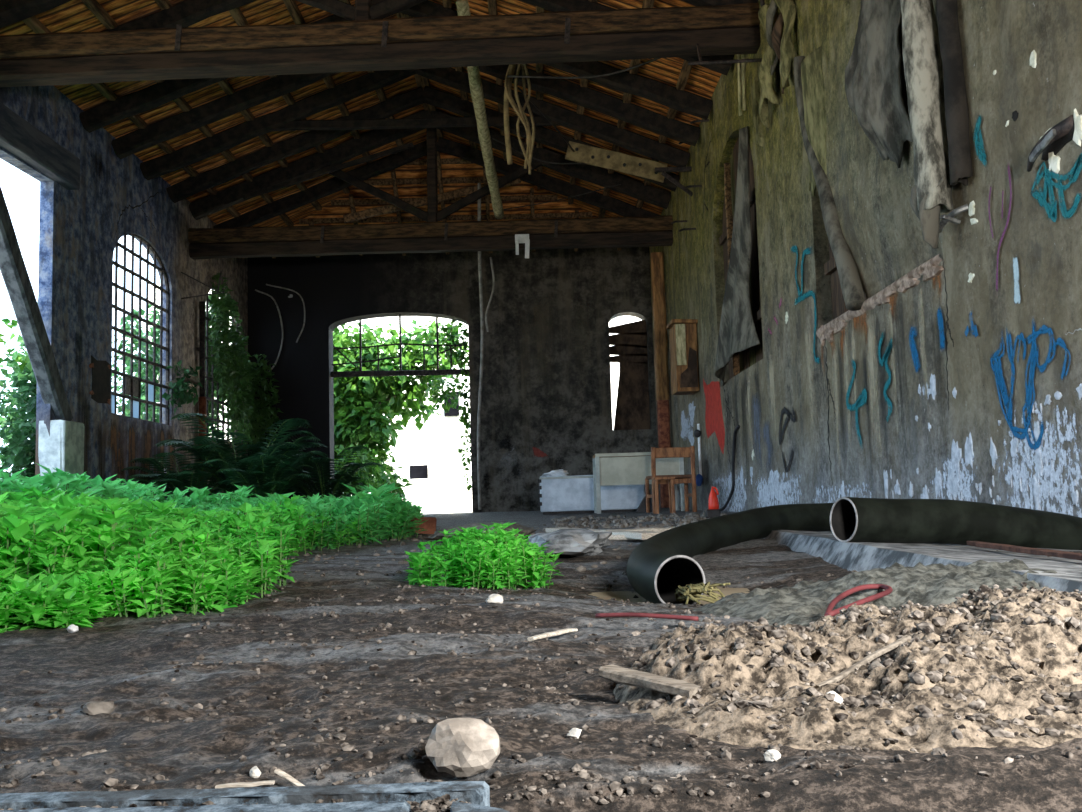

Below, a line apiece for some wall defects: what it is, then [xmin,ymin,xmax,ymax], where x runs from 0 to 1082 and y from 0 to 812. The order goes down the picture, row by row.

spalling [968,200,978,225]
peeling [918,373,936,400]
peeling [883,391,1082,518]
peeling [712,449,802,512]
peeling [814,481,871,503]